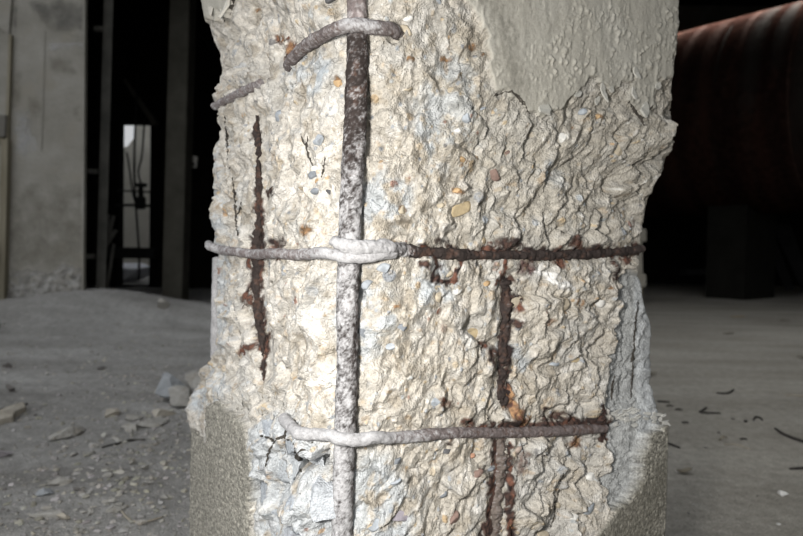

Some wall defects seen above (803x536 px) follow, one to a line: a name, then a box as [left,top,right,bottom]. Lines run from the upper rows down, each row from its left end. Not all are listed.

rust [275,35,296,61]
rust [238,186,286,383]
spalling [184,0,347,536]
spalling [353,0,678,536]
rust [419,235,640,443]
crack [610,302,639,400]
rust [479,438,527,536]